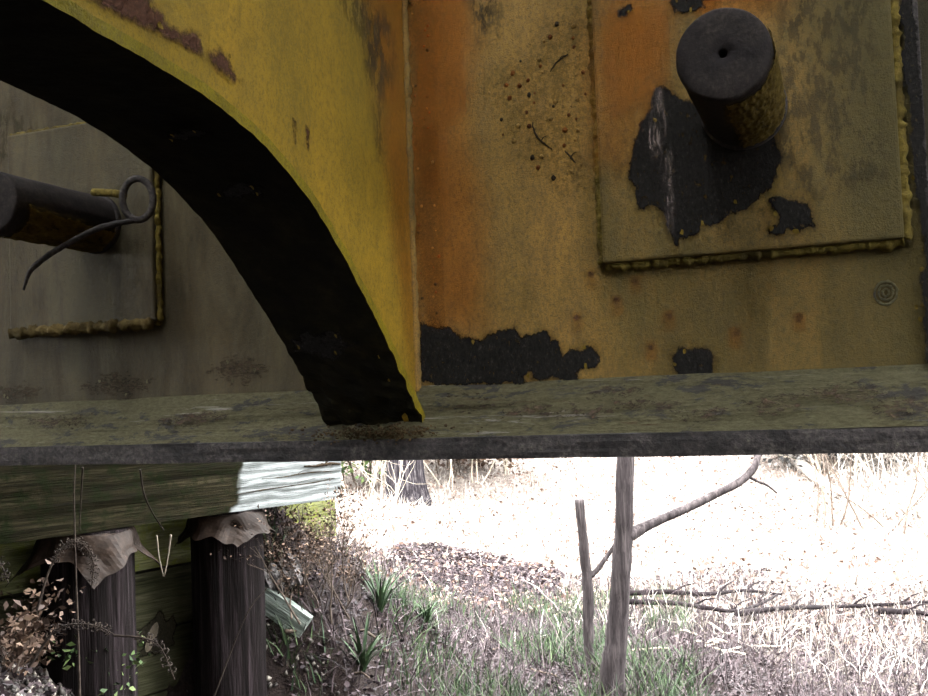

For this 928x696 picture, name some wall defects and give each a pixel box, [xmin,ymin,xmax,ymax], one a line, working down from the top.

peeling [670,0,706,13]
rust [98,0,236,82]
peeling [628,29,816,246]
peeling [420,322,600,386]
peeling [672,347,714,374]